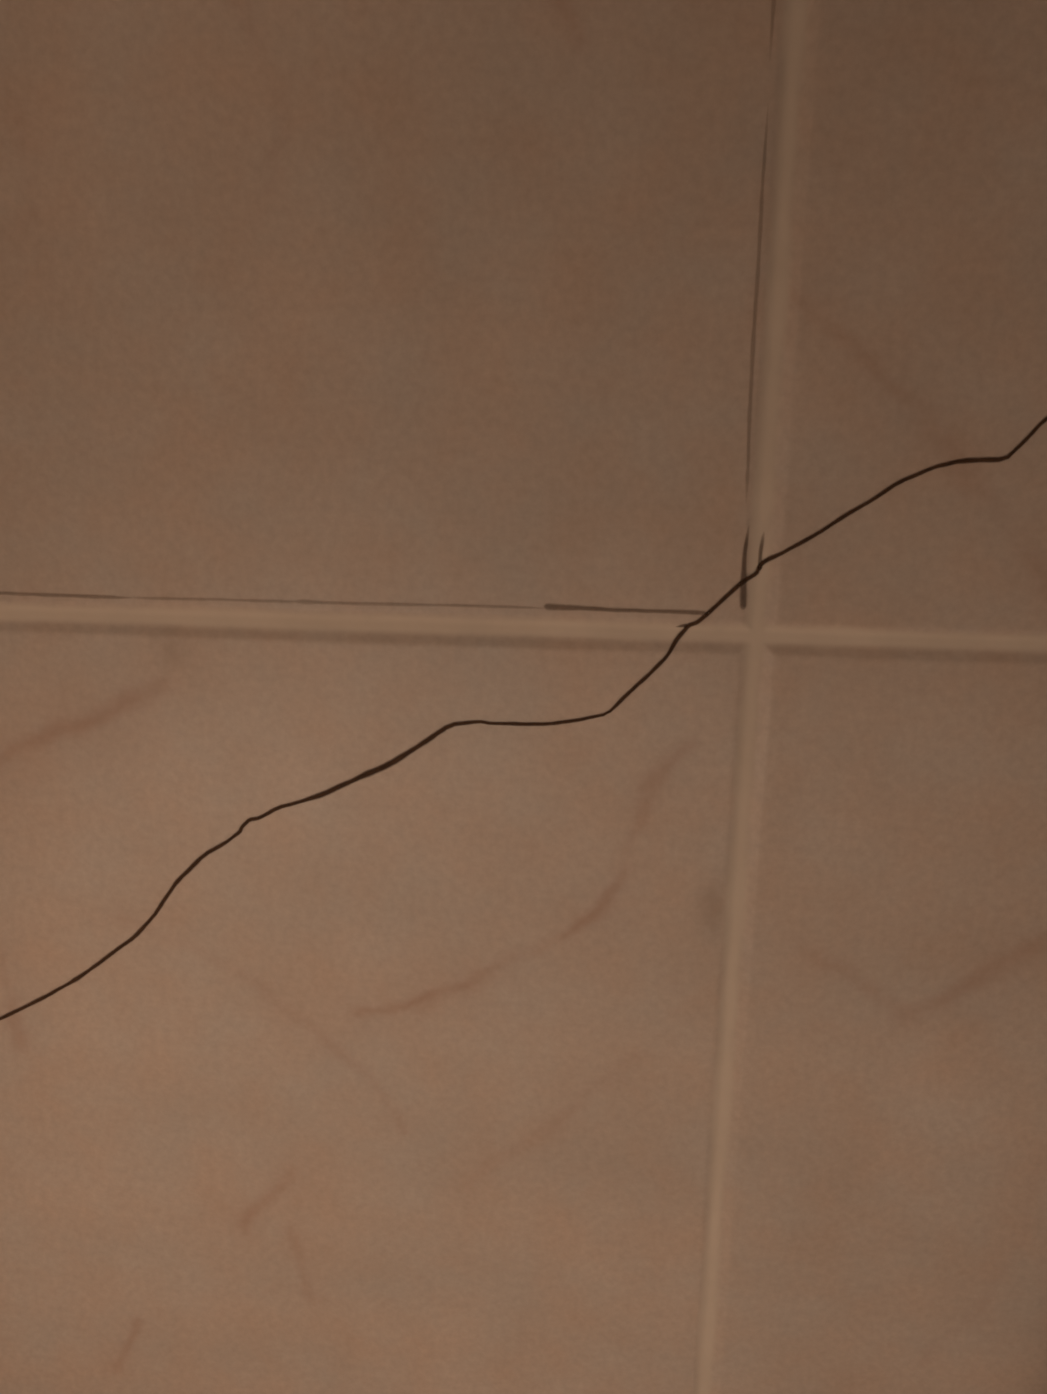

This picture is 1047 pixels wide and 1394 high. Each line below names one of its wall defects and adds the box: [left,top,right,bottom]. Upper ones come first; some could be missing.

crack [0,417,1047,1020]